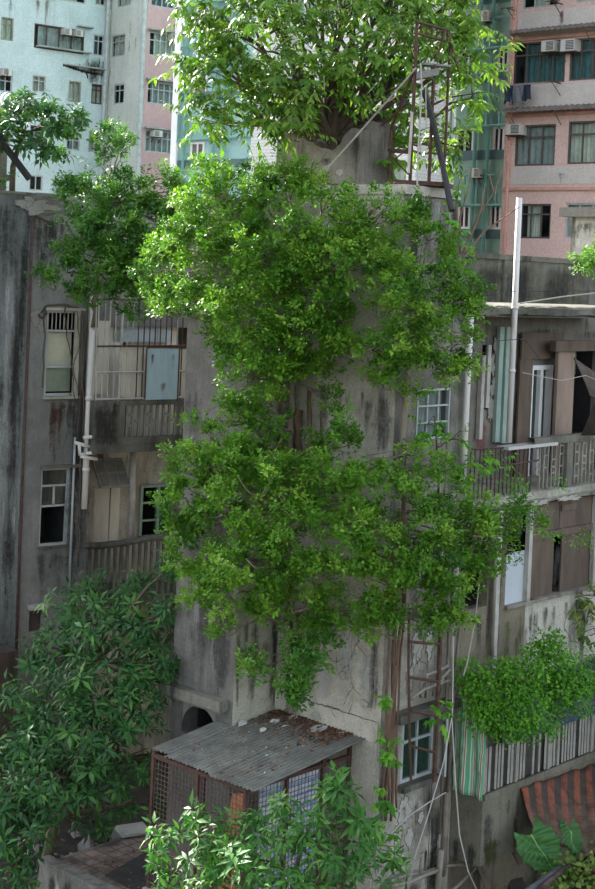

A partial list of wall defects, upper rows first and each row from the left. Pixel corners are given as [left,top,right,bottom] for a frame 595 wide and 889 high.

peeling [14,196,64,216]
damp [0,220,64,576]
crack [299,628,374,722]